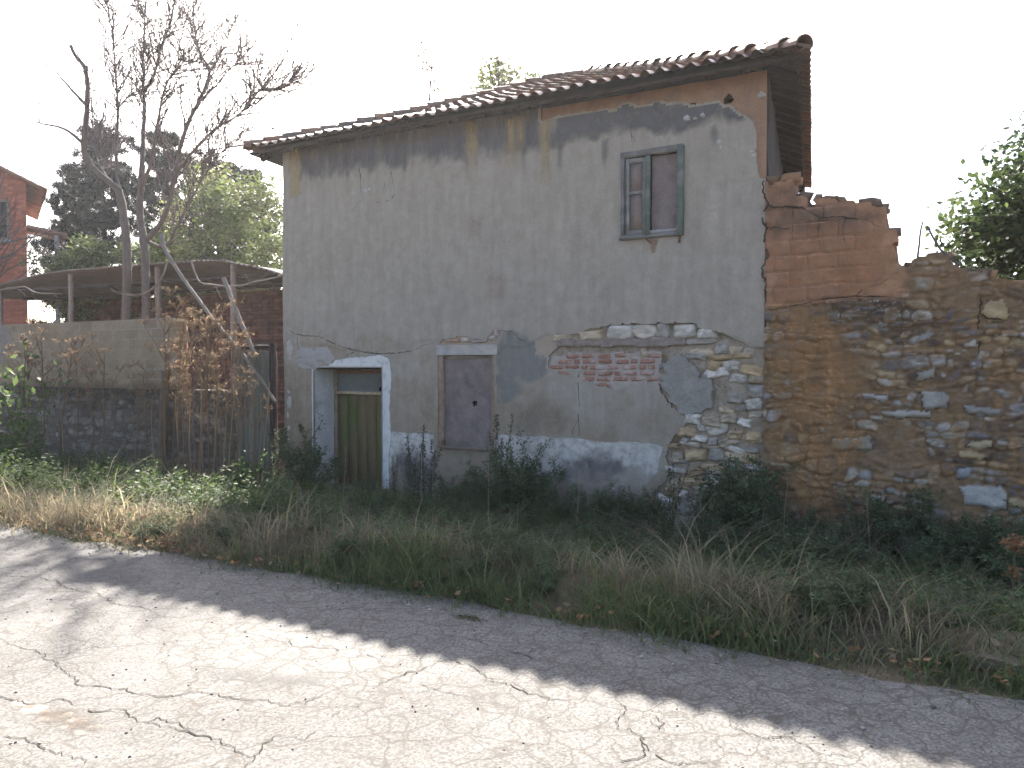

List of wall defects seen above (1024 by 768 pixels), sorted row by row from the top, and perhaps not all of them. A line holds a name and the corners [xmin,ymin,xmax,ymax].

water stain [292,96,744,175]
spalling [542,70,767,179]
crack [761,180,906,310]
crack [291,331,428,358]
spalling [536,322,766,520]